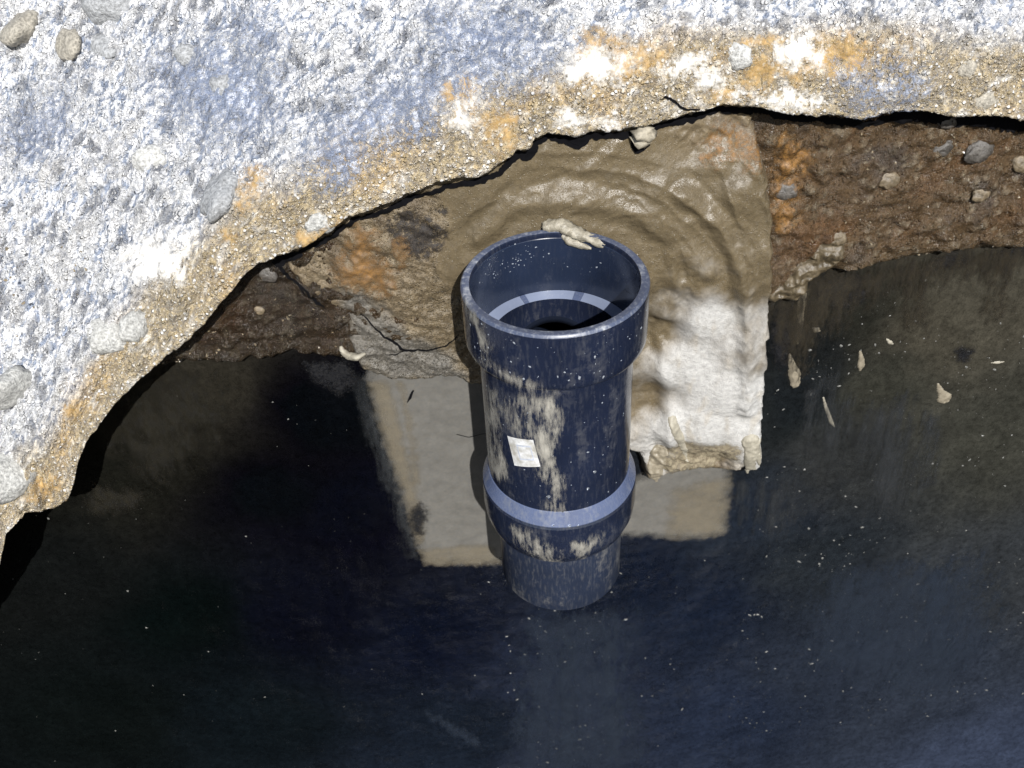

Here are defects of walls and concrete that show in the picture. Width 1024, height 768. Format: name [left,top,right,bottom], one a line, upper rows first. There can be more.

spalling [629,125,657,150]
spalling [714,117,763,168]
crack [272,96,1024,309]
corrosion [771,134,811,231]
spalling [384,209,448,260]
peeling [339,346,366,361]
crack [360,314,459,374]
peeling [361,371,502,565]
peeling [621,442,742,538]